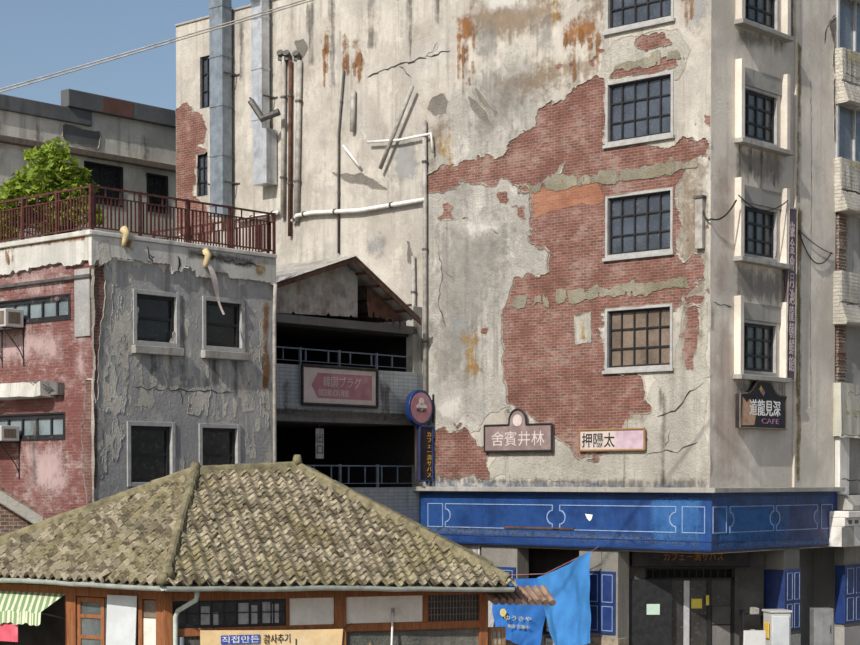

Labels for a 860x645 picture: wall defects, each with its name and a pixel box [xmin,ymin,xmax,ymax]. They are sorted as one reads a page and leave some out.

rust [342,34,363,81]
crack [367,44,449,78]
rust [457,0,559,85]
rust [496,0,601,104]
flaking render [175,102,216,244]
crack [178,254,259,271]
flaking render [407,28,712,488]
peeling [81,240,273,505]
crack [136,386,235,406]
crack [646,382,704,456]